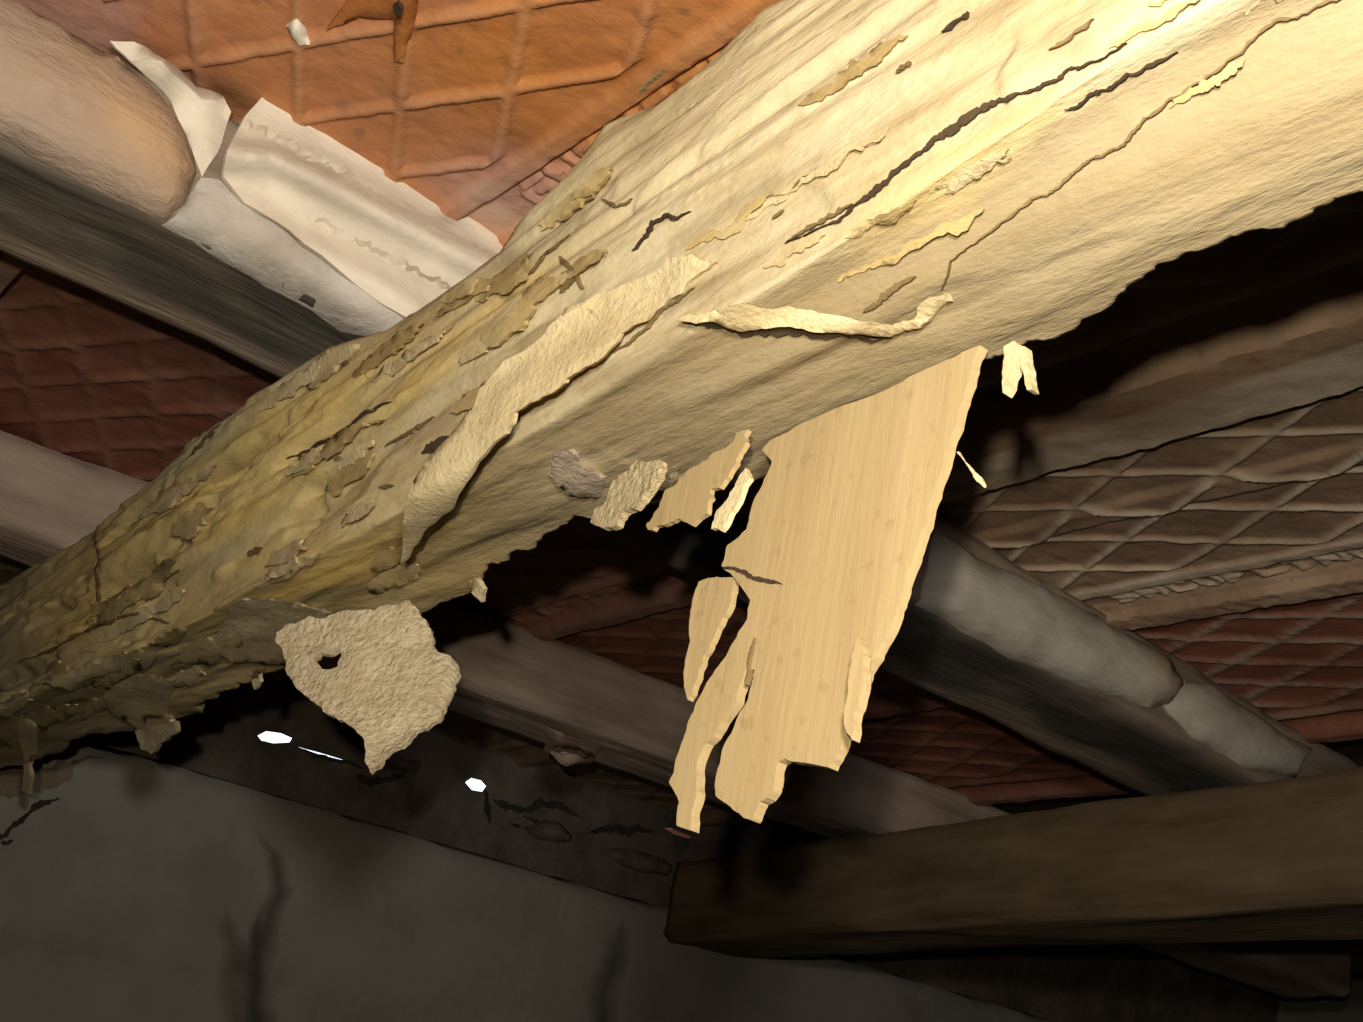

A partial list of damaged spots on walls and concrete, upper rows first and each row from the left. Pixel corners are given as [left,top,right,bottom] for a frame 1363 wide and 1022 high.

crack [601,0,1342,358]
peeling [209,128,888,775]
crack [0,756,104,845]